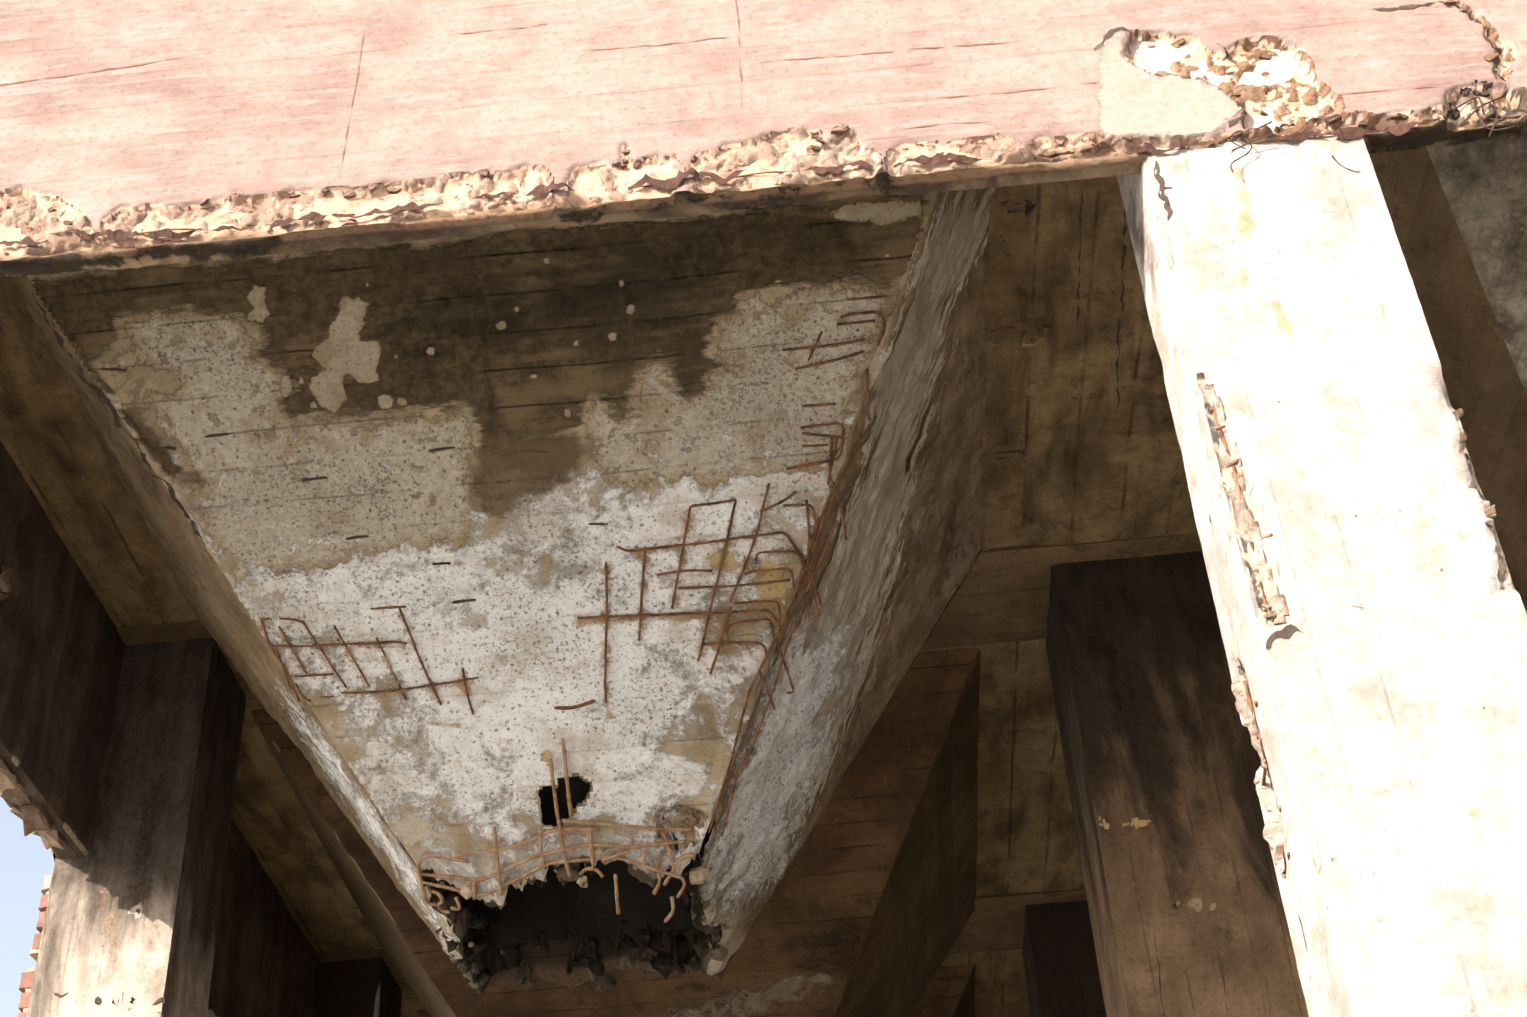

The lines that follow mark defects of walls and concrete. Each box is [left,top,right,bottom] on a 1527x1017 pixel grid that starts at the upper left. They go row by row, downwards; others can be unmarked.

spalling [0,0,1527,257]
peeling [104,282,484,584]
rust [313,636,473,703]
damp [31,193,928,959]
peeling [260,187,995,958]
rust [577,501,805,691]
peeling [1098,815,1153,829]
spalling [1197,372,1289,625]
spalling [1231,656,1290,877]
spalling [1452,408,1514,591]